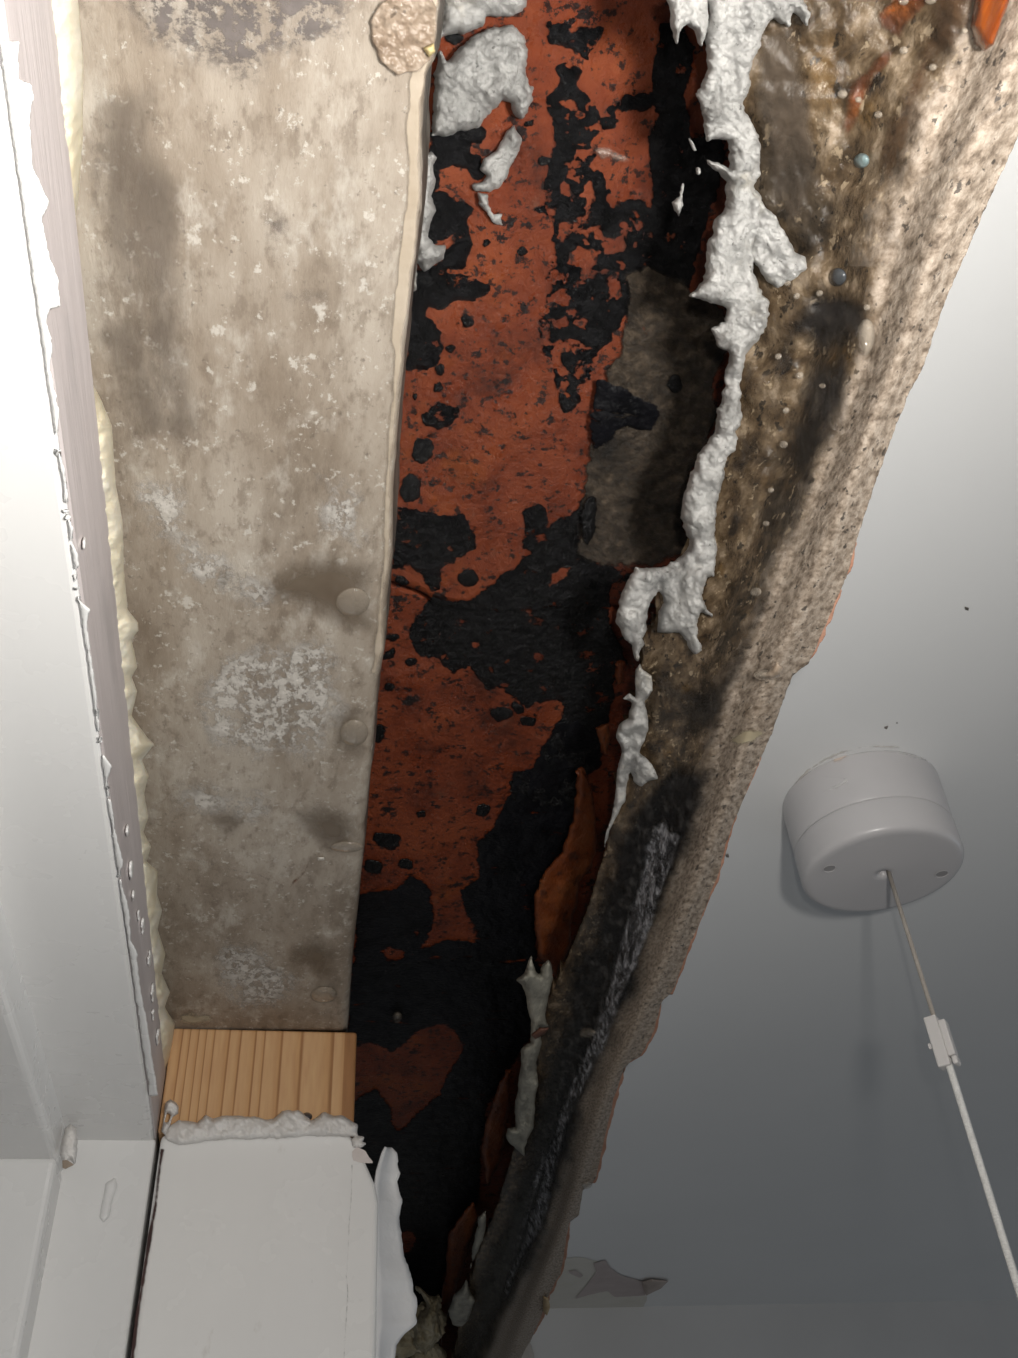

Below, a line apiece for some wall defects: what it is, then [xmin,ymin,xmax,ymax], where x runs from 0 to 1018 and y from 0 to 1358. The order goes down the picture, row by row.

water stain [145,0,340,63]
water stain [596,149,624,159]
water stain [112,106,169,287]
water stain [795,296,864,349]
water stain [795,363,846,483]
water stain [202,644,341,752]
water stain [673,655,743,729]
water stain [182,789,267,822]
water stain [218,948,295,1007]
water stain [460,771,710,1358]
peeling [352,1147,417,1358]
peeling [543,1257,668,1316]